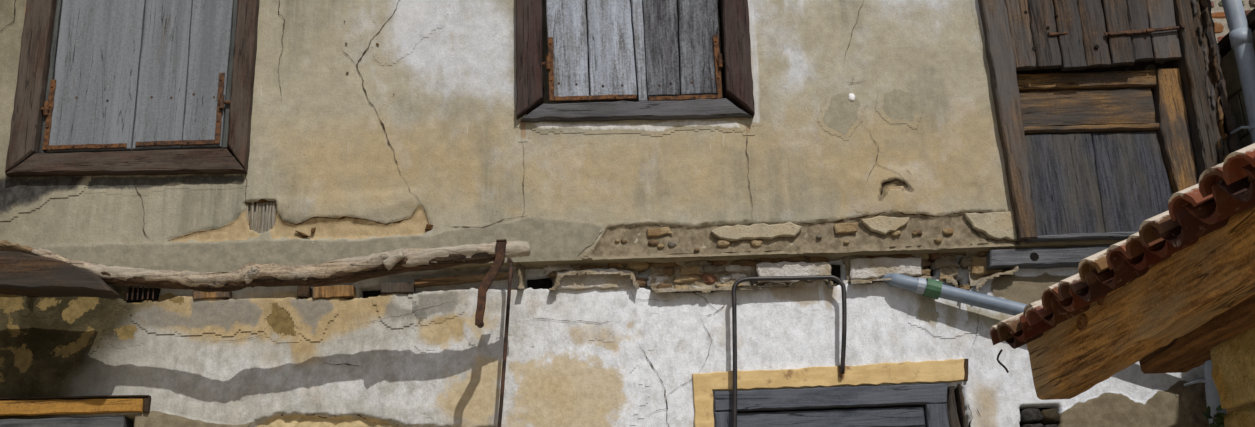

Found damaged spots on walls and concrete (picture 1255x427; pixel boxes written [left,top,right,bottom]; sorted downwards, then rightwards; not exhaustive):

crack [277,1,531,228]
crack [135,174,247,241]
flaking render [165,199,434,244]
flaking render [881,179,910,195]
peeling [0,284,339,392]
flaking render [248,208,1026,427]
crack [628,289,724,426]
spalling [1019,408,1060,427]
flaking render [1175,379,1209,427]